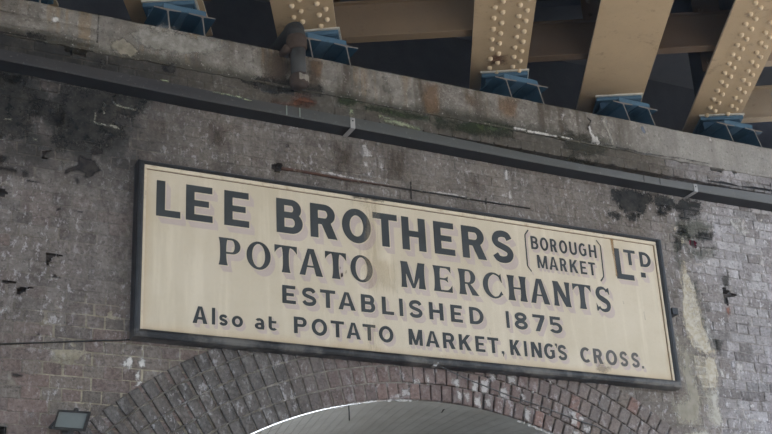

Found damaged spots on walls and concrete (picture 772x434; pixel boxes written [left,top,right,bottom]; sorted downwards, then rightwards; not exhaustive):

water stain [680,259,724,434]